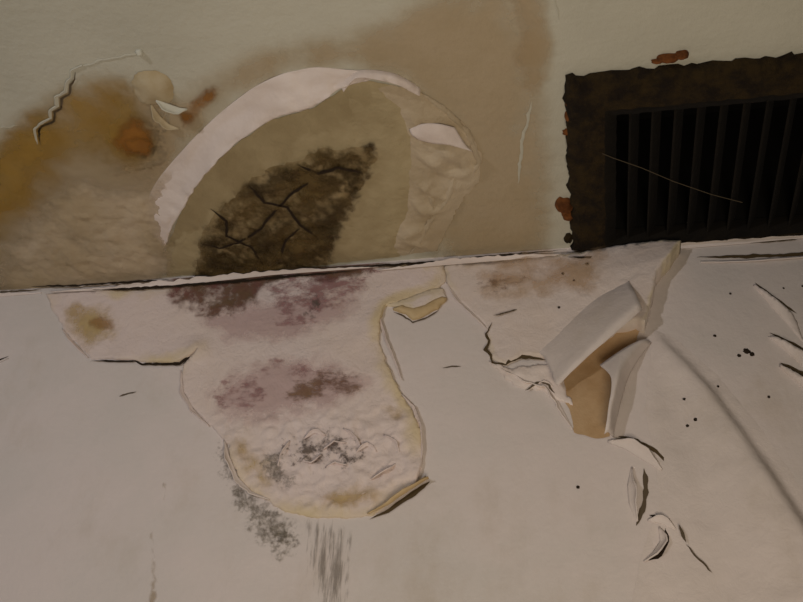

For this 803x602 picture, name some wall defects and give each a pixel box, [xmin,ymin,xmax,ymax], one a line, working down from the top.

corrosion [651,50,689,64]
corrosion [181,90,215,123]
damp [361,0,547,262]
damp [0,93,202,290]
corrosion [555,197,573,221]
crack [0,249,597,297]
crack [681,235,803,263]
damp [168,263,383,334]
peeling [46,67,711,572]
damp [216,360,358,410]
damp [300,431,363,464]
damp [233,486,288,543]